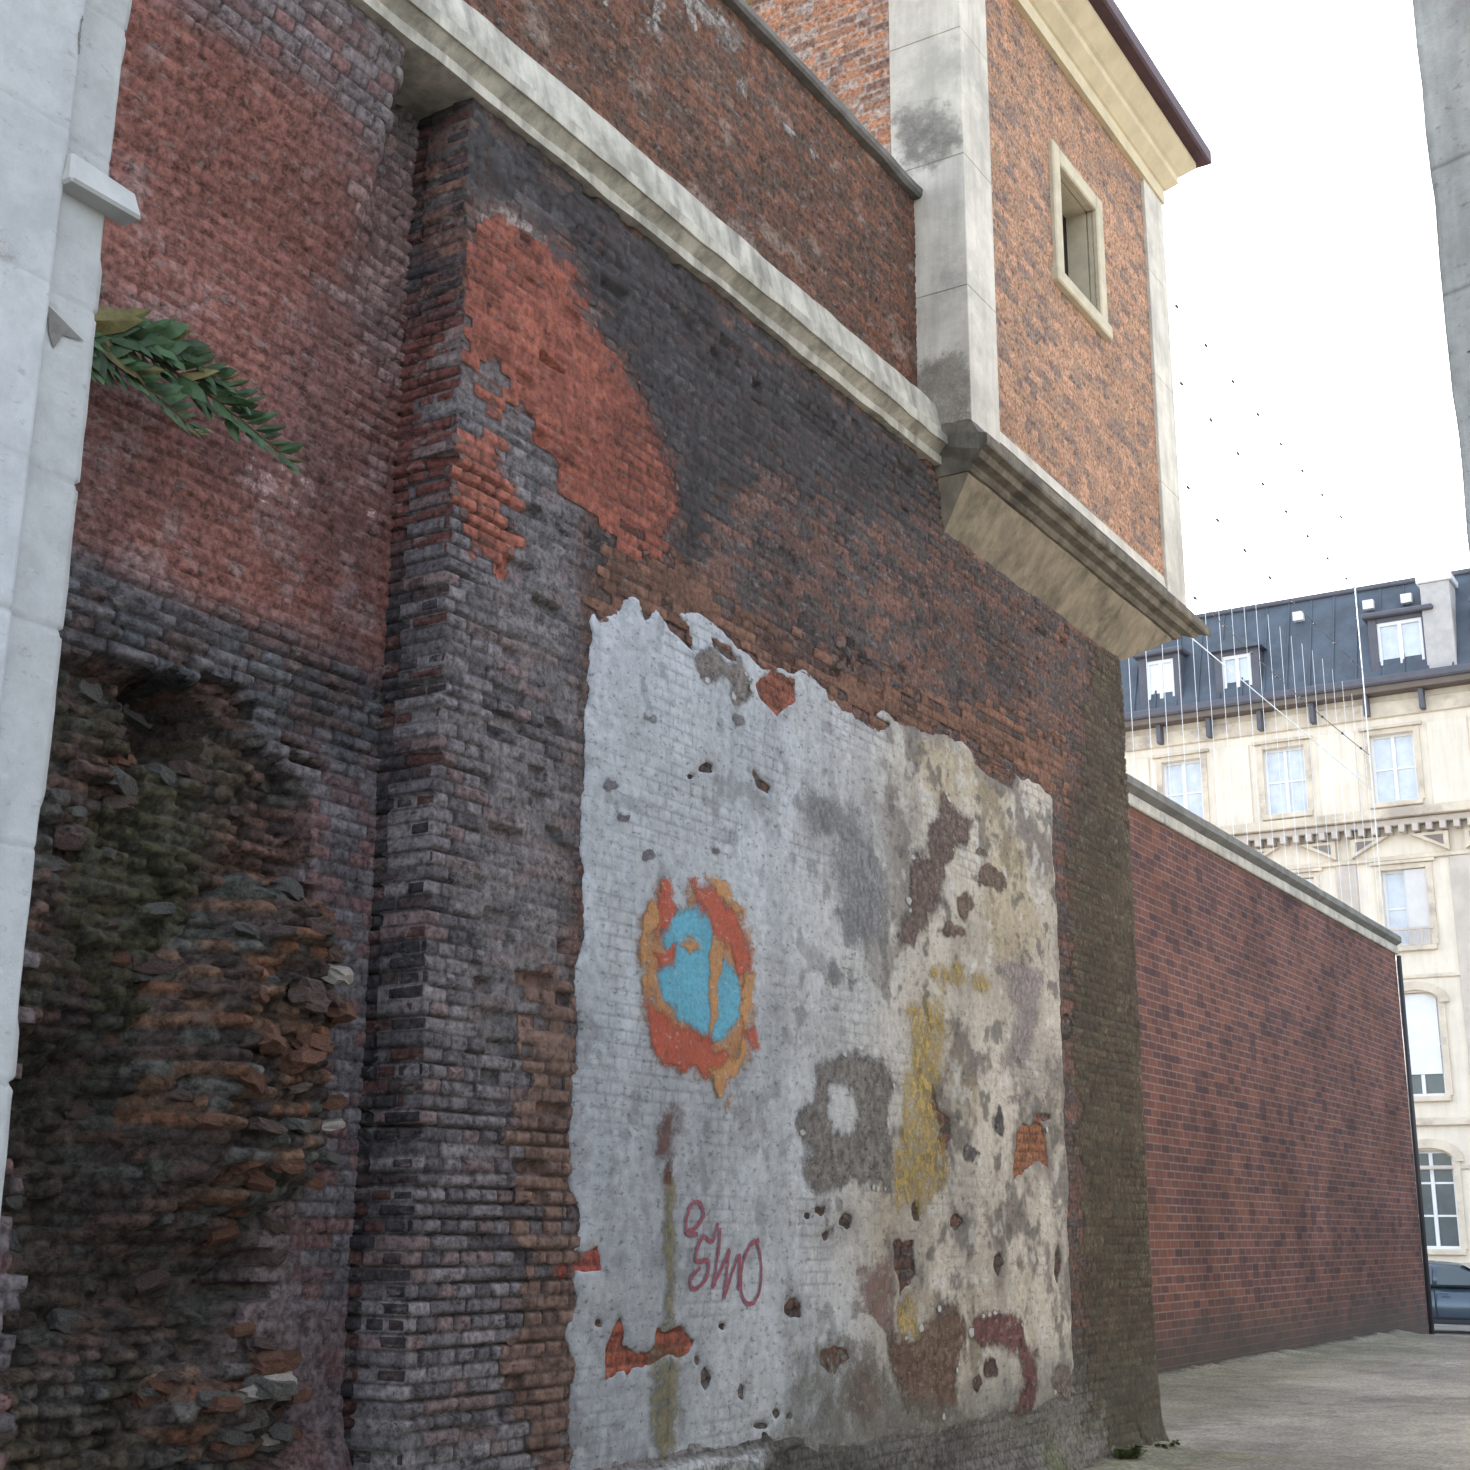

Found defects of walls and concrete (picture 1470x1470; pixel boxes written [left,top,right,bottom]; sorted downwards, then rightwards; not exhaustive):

leakage [890,100,963,168]
spalling [446,192,1072,807]
spalling [642,849,656,861]
spalling [0,651,326,1470]
peeling [1002,957,1044,1075]
spalling [963,1144,980,1163]
spalling [996,1086,1048,1178]
spalling [605,1318,694,1380]